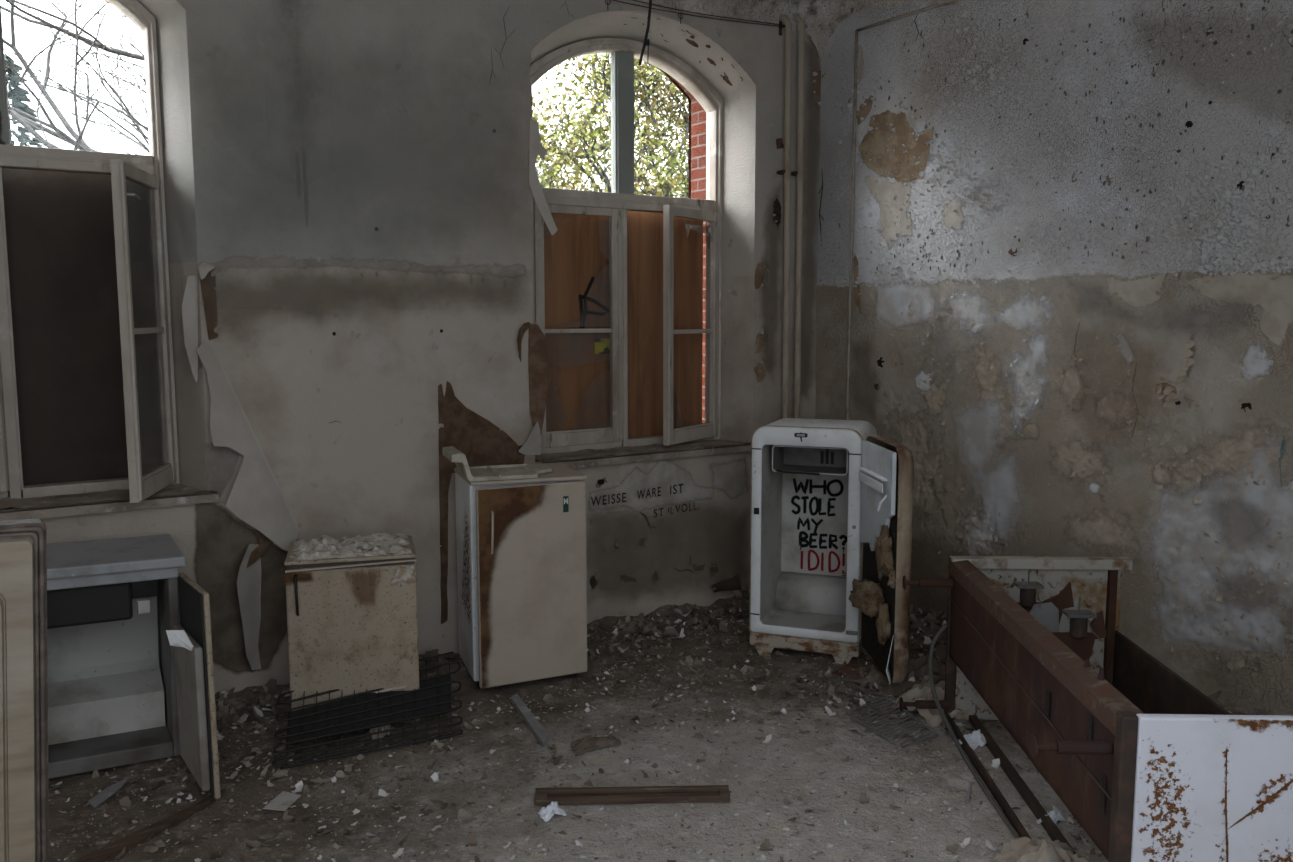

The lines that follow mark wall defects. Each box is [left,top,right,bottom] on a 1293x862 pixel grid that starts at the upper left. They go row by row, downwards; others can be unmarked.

peeling [1089,116,1164,259]
peeling [1175,101,1205,165]
peeling [1230,147,1286,207]
peeling [1187,272,1293,380]
leakage [1154,452,1293,651]